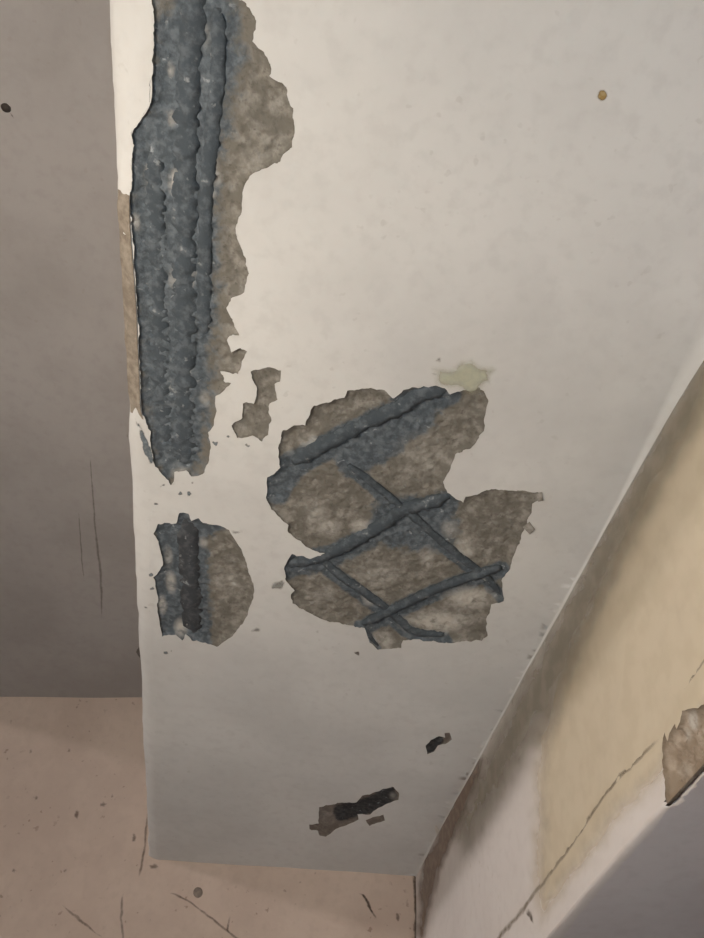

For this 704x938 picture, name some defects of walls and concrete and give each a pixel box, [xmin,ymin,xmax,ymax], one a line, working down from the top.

spalling [117,0,295,486]
spalling [266,364,543,650]
spalling [145,513,254,647]
damp [420,361,704,938]
peeling [309,787,399,837]
crack [410,876,418,938]
peeling [426,733,452,754]
crack [499,752,645,938]
spalling [662,705,704,806]